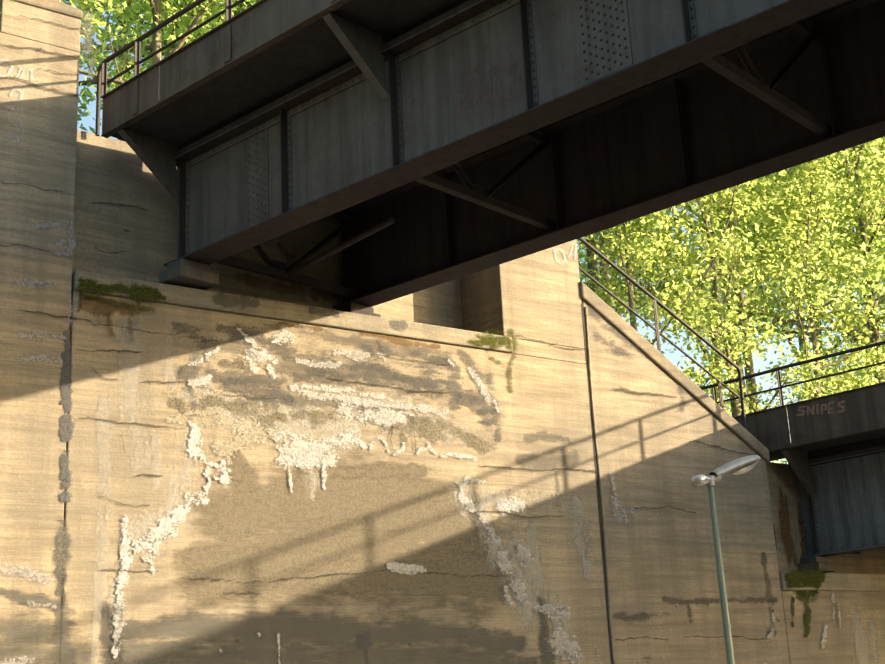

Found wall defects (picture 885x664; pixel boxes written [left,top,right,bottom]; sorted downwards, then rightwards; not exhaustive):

corrosion [80,295,138,334]
water stain [0,300,585,664]
corrosion [773,489,805,566]
crack [101,567,158,575]
crack [182,570,386,595]
crack [425,570,515,578]
water stain [662,552,777,641]
water stain [614,612,668,621]